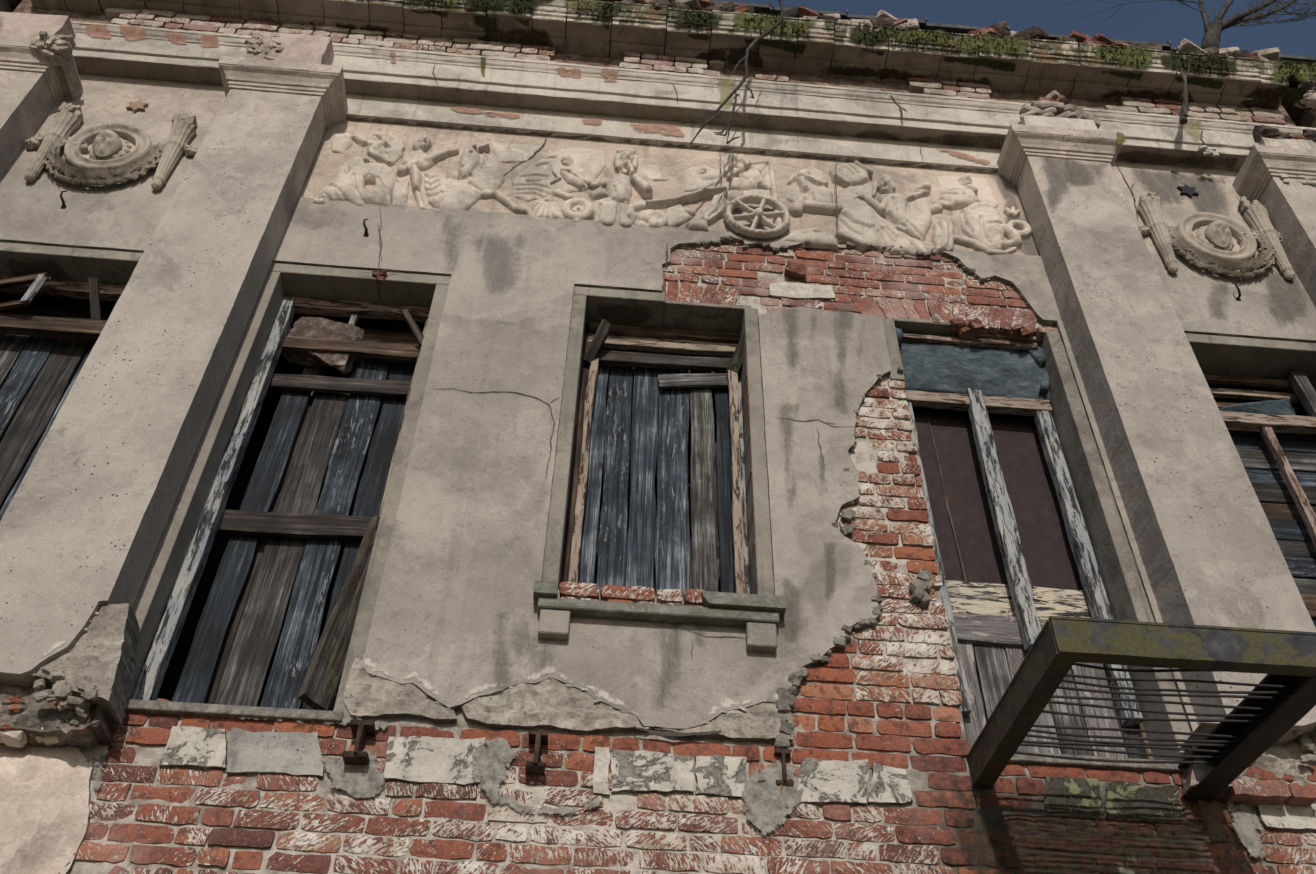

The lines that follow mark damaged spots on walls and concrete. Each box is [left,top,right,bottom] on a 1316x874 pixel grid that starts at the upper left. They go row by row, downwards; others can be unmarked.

damp [300,21,388,32]
damp [819,67,991,85]
damp [1240,87,1284,110]
spalling [360,223,407,285]
flaking render [662,235,1058,346]
crack [434,388,560,479]
flaking render [343,364,969,758]
spalling [0,603,140,748]
spalling [1181,743,1214,796]
spalling [1215,726,1316,807]